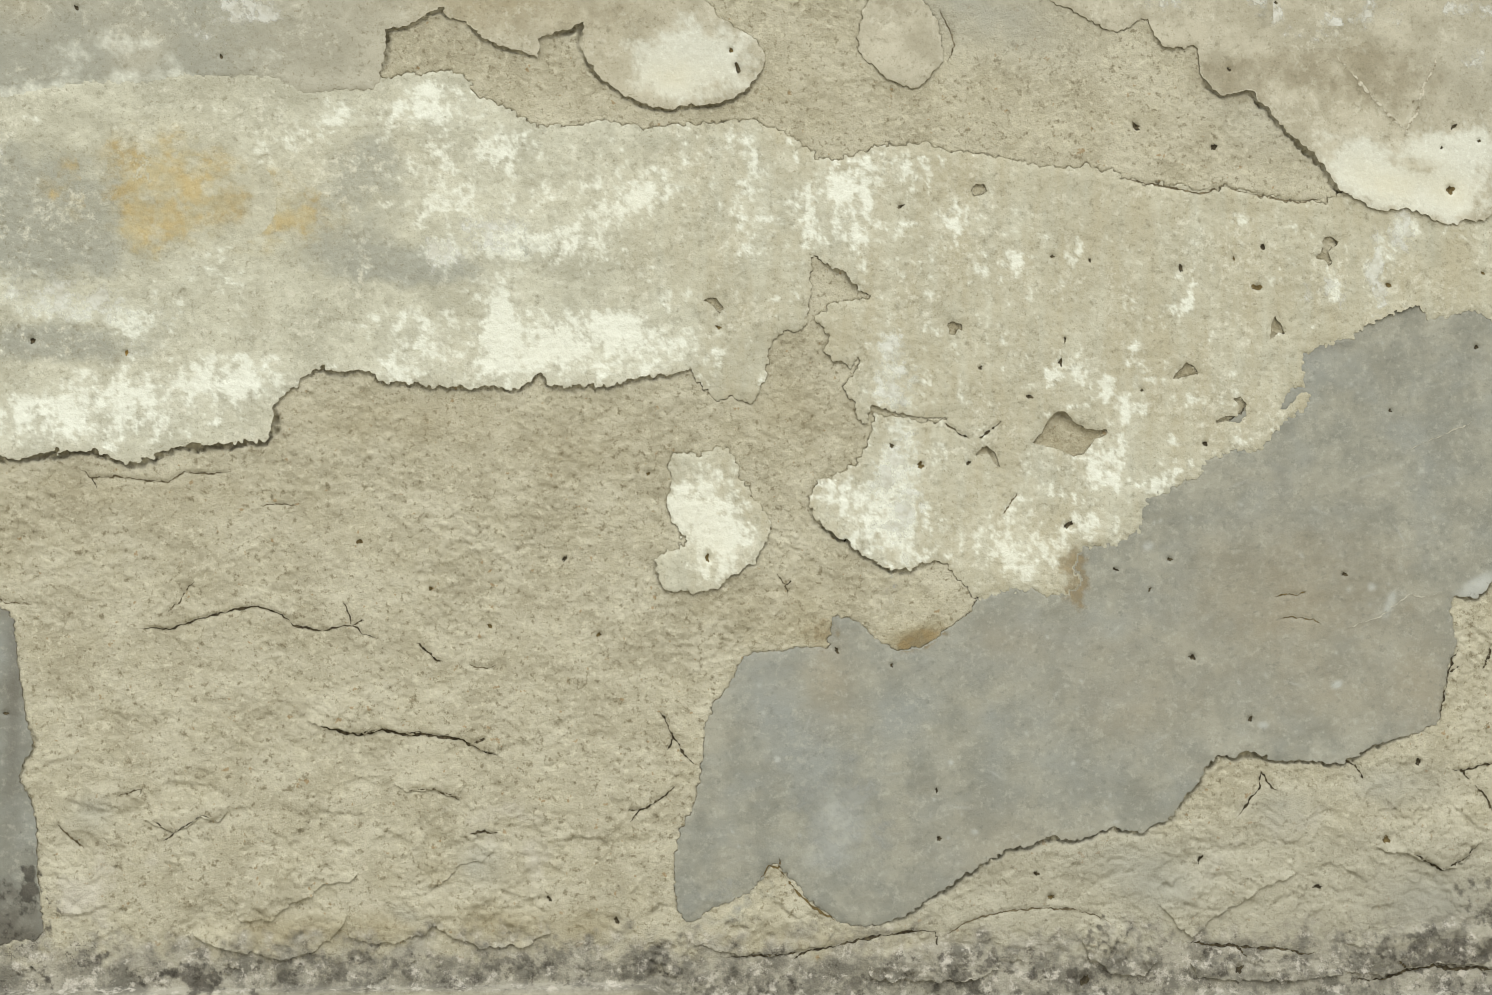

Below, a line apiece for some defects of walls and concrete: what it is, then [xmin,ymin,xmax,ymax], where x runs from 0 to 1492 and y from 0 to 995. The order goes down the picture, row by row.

spalling [379,0,1492,225]
crack [136,582,376,638]
spalling [0,236,1492,955]
crack [321,726,492,754]
water stain [4,866,60,959]
water stain [138,963,222,995]